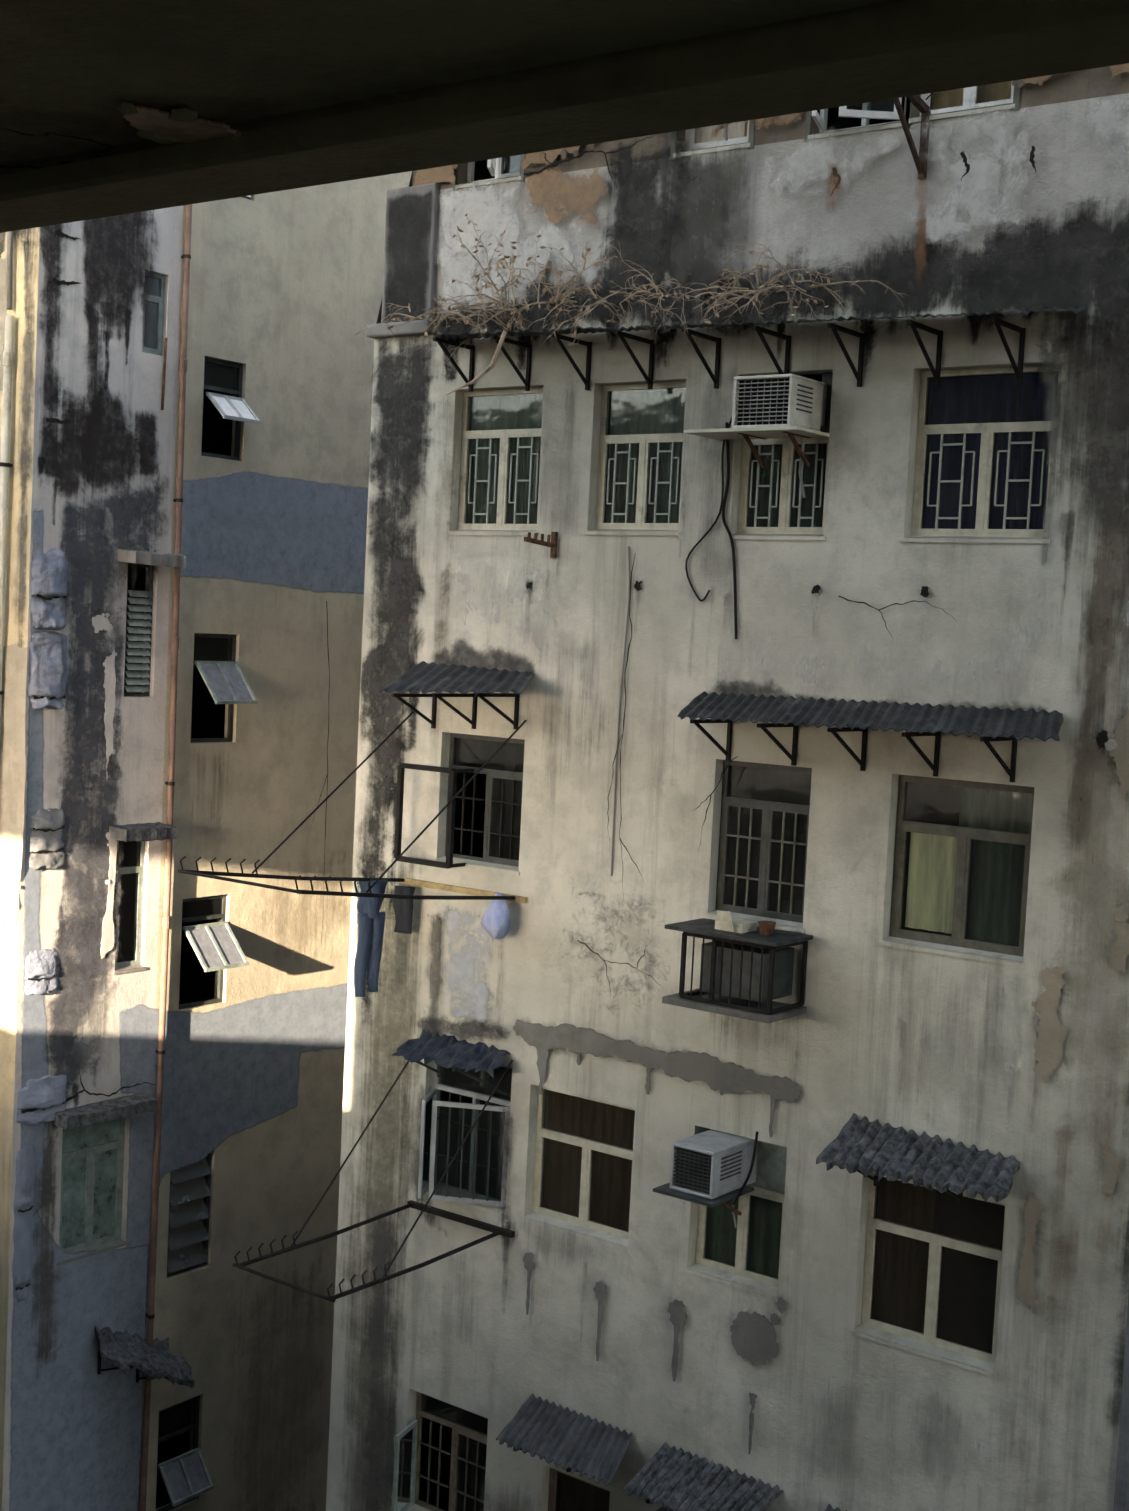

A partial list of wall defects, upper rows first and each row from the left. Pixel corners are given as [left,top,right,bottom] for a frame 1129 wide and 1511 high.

peeling [1011,74,1056,88]
peeling [1110,63,1129,78]
peeling [754,113,800,129]
peeling [1085,99,1129,159]
peeling [776,134,898,192]
peeling [413,144,608,310]
crack [838,596,957,642]
damp [0,211,166,1105]
damp [347,135,1129,1511]
crack [577,939,664,997]
peeling [1031,966,1068,1084]